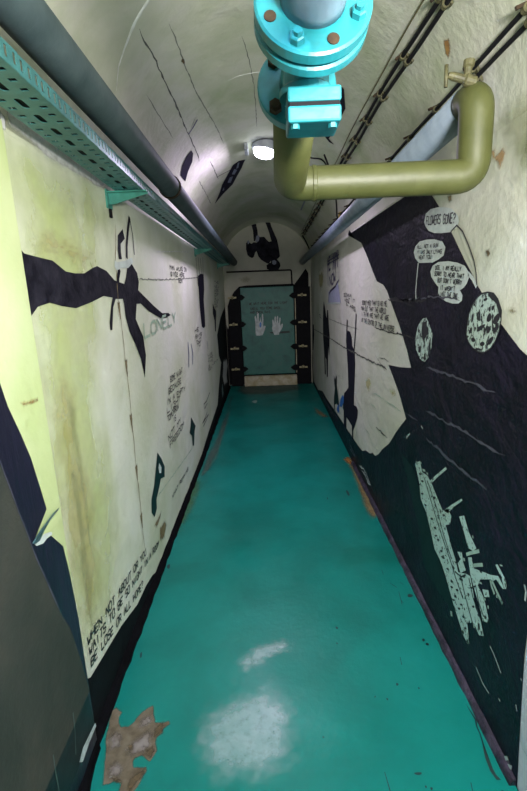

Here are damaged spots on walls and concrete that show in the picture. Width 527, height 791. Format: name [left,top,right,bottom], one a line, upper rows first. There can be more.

crack [140,24,224,203]
crack [242,38,257,126]
spalling [80,723,96,762]
peeling [103,706,169,791]